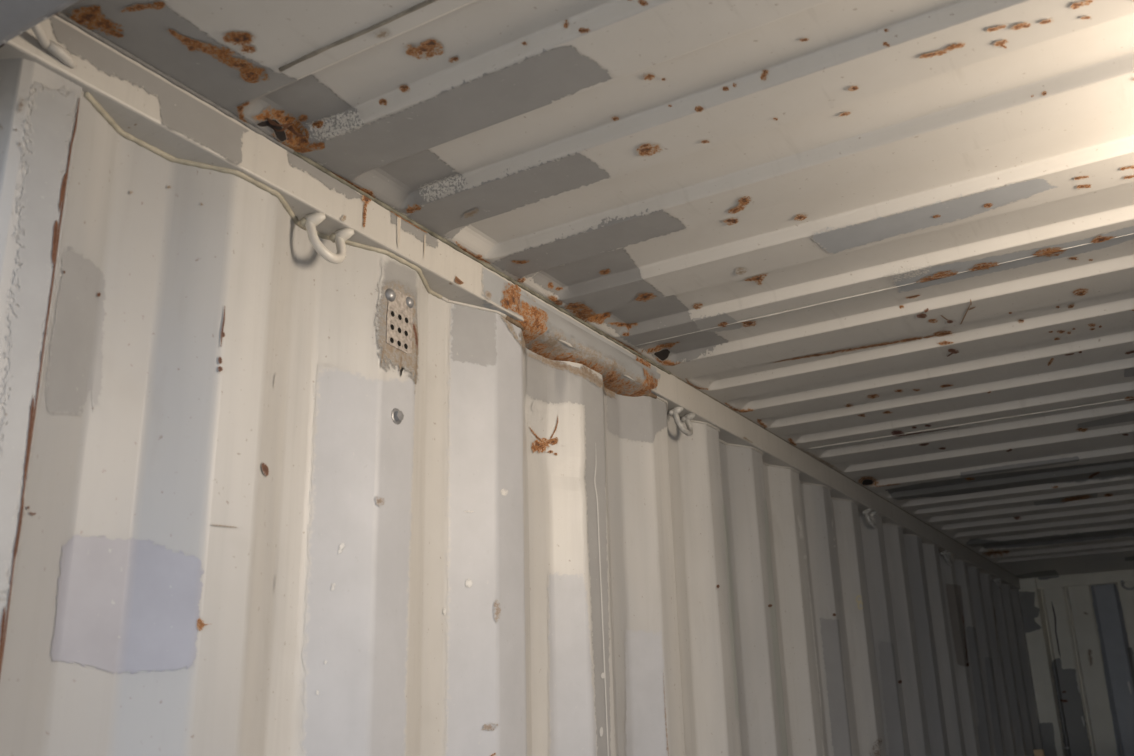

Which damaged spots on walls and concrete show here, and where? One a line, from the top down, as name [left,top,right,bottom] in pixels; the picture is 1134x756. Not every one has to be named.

corrosion [53,0,166,38]
corrosion [167,29,269,83]
corrosion [404,39,459,63]
corrosion [919,43,965,59]
corrosion [237,101,326,153]
corrosion [635,142,663,157]
corrosion [329,171,375,227]
corrosion [723,196,752,226]
corrosion [900,261,1002,309]
corrosion [485,260,681,399]
corrosion [774,308,959,363]
corrosion [529,418,558,456]